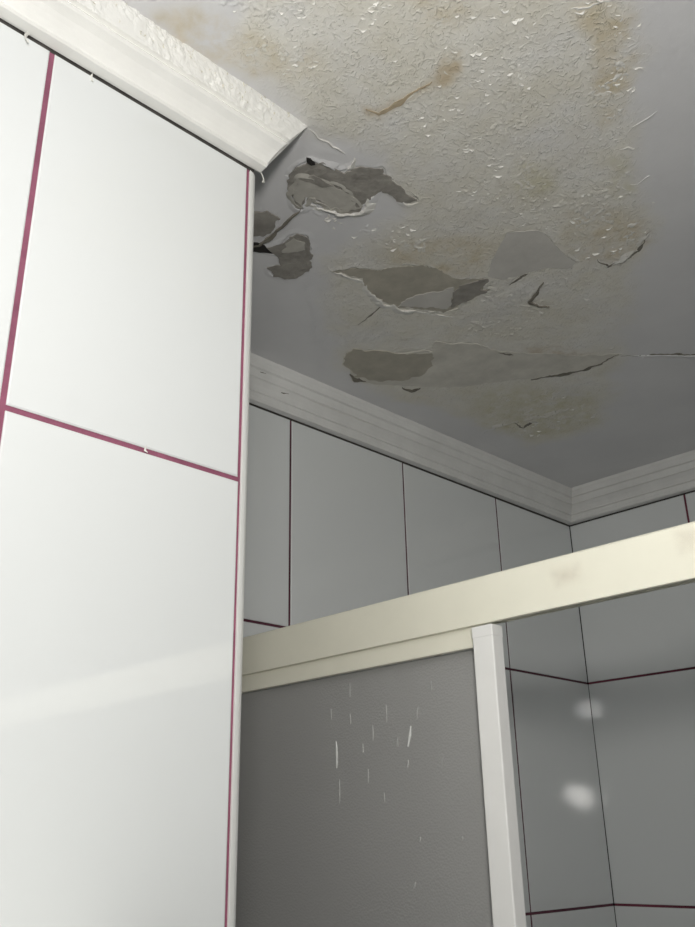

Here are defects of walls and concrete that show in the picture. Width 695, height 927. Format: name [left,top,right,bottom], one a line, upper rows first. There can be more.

peeling [253,156,426,280]
water stain [139,0,679,455]
peeling [328,228,580,318]
peeling [340,340,623,393]
crack [627,352,695,360]